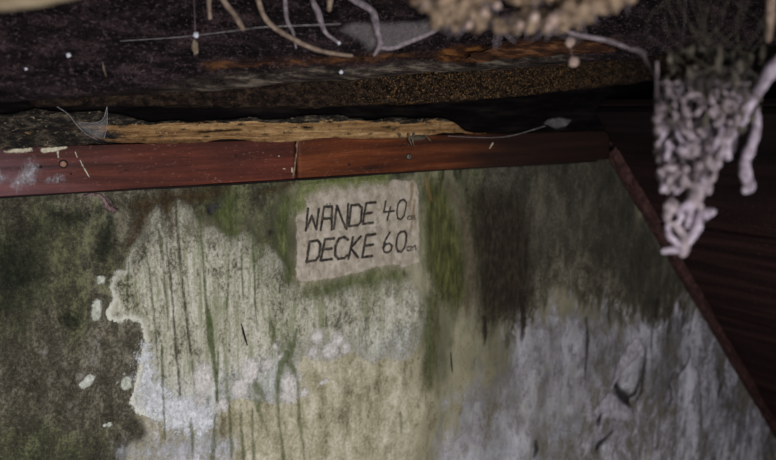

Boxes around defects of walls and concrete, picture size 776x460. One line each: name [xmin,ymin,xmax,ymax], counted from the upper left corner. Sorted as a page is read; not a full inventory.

damp [128,189,224,265]
damp [129,277,309,460]
damp [308,329,350,358]
damp [454,189,533,344]